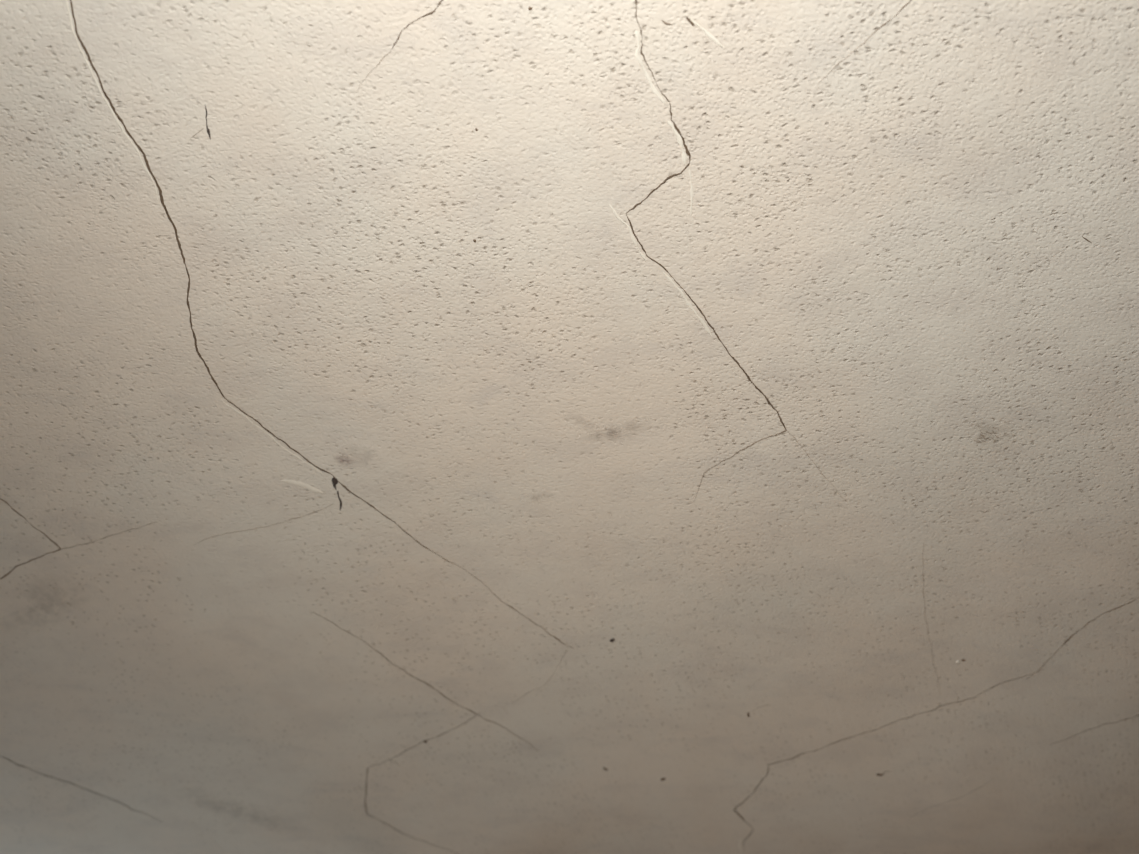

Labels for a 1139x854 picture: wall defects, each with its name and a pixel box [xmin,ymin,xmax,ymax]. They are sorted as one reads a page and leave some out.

crack [824,0,912,78]
crack [66,0,572,648]
crack [609,0,845,501]
crack [0,498,155,579]
crack [313,612,538,854]
crack [734,544,1138,851]